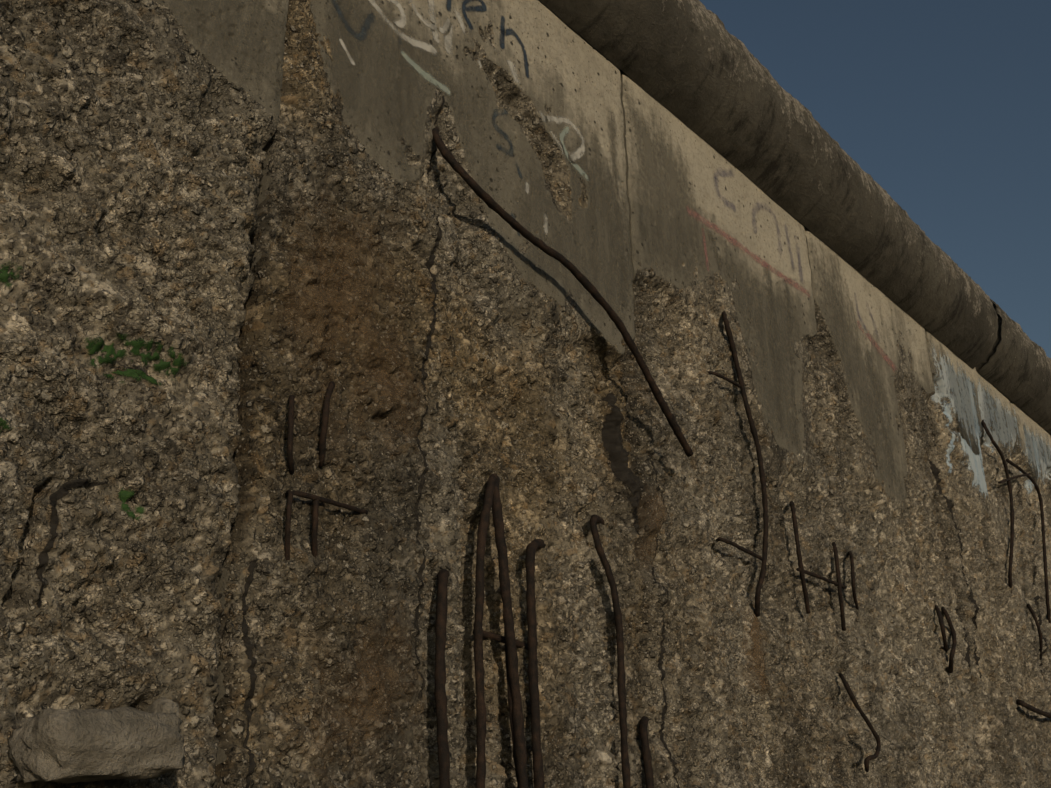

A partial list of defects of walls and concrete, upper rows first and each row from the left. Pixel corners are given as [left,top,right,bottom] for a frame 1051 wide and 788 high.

spalling [0,0,693,788]
spalling [620,250,1051,788]